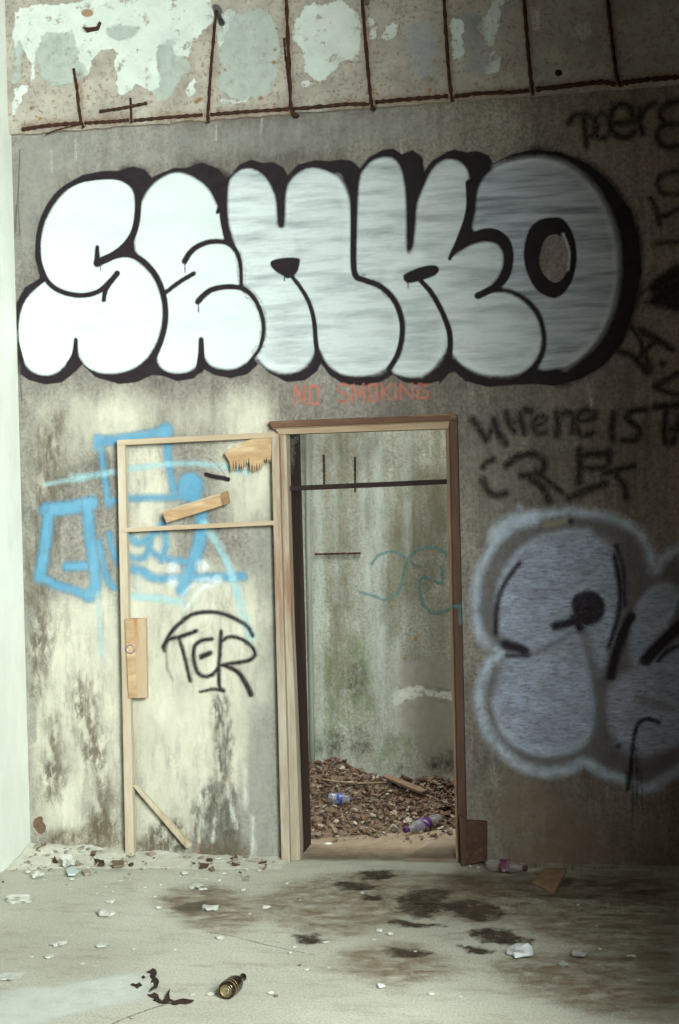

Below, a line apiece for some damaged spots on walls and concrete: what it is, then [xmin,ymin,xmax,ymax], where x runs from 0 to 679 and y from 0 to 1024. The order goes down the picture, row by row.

corrosion [17,71,136,134]
corrosion [154,0,296,124]
peeling [11,0,679,135]
corrosion [323,0,679,112]
water stain [22,407,281,857]
water stain [145,829,679,1024]